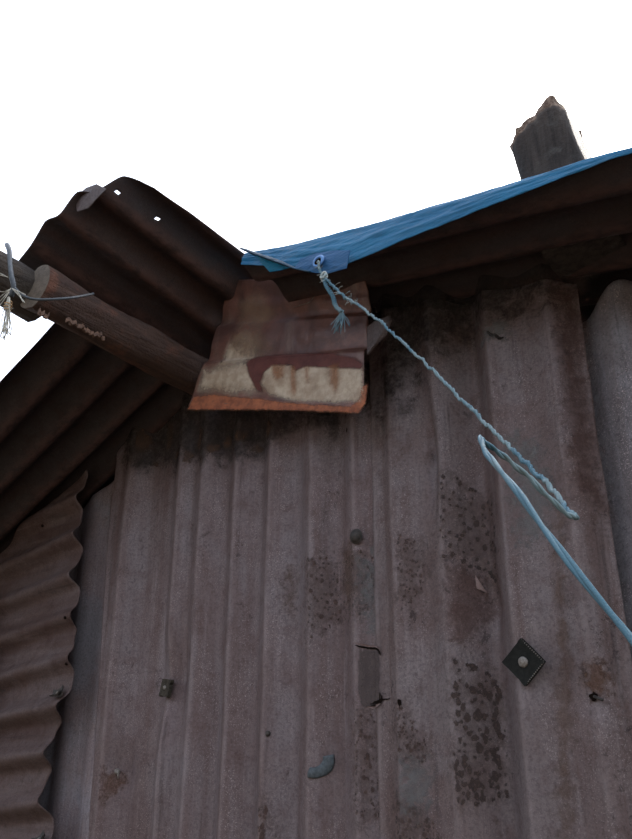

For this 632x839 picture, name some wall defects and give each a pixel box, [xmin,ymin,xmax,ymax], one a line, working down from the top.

corrosion [188,353,368,413]
corrosion [451,659,509,806]